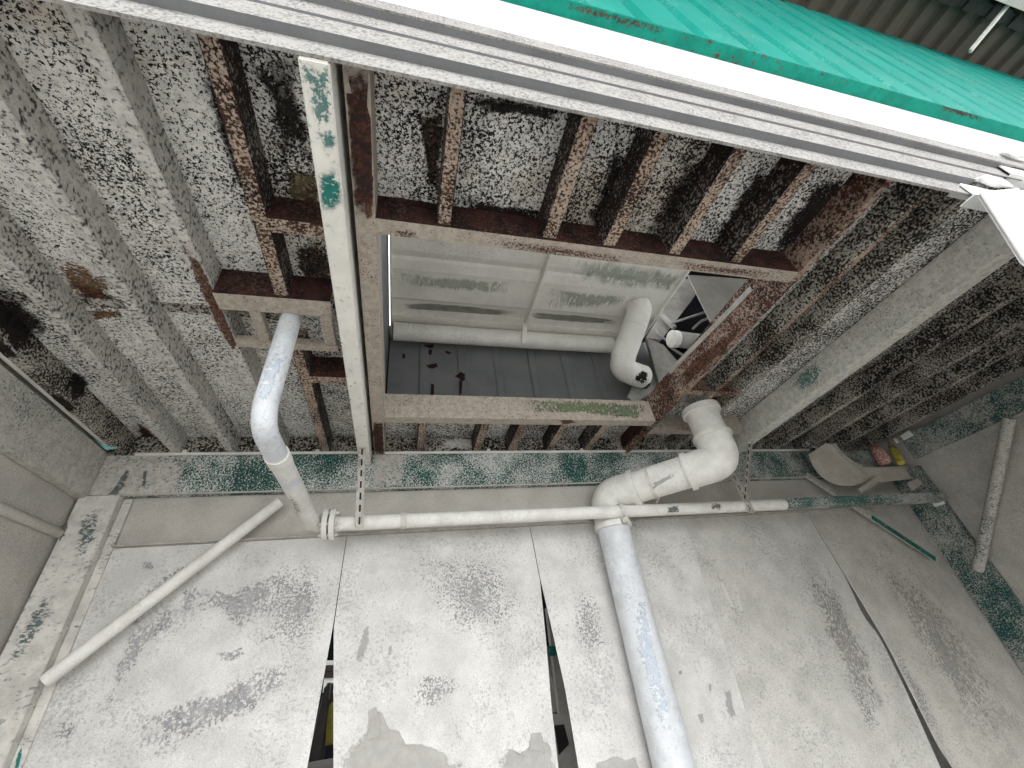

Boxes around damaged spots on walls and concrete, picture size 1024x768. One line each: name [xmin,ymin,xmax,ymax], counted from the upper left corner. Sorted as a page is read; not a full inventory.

corrosion [346,72,374,218]
corrosion [60,262,122,320]
corrosion [677,325,745,387]
corrosion [620,426,646,448]